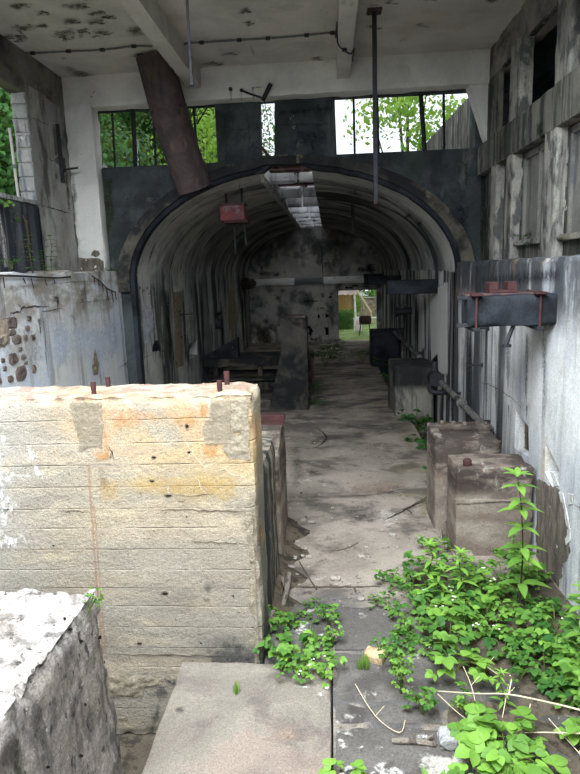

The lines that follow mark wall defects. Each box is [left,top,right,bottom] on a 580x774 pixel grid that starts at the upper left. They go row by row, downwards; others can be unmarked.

water stain [57,3,115,41]
flaking render [0,316,37,384]
water stain [0,449,43,548]